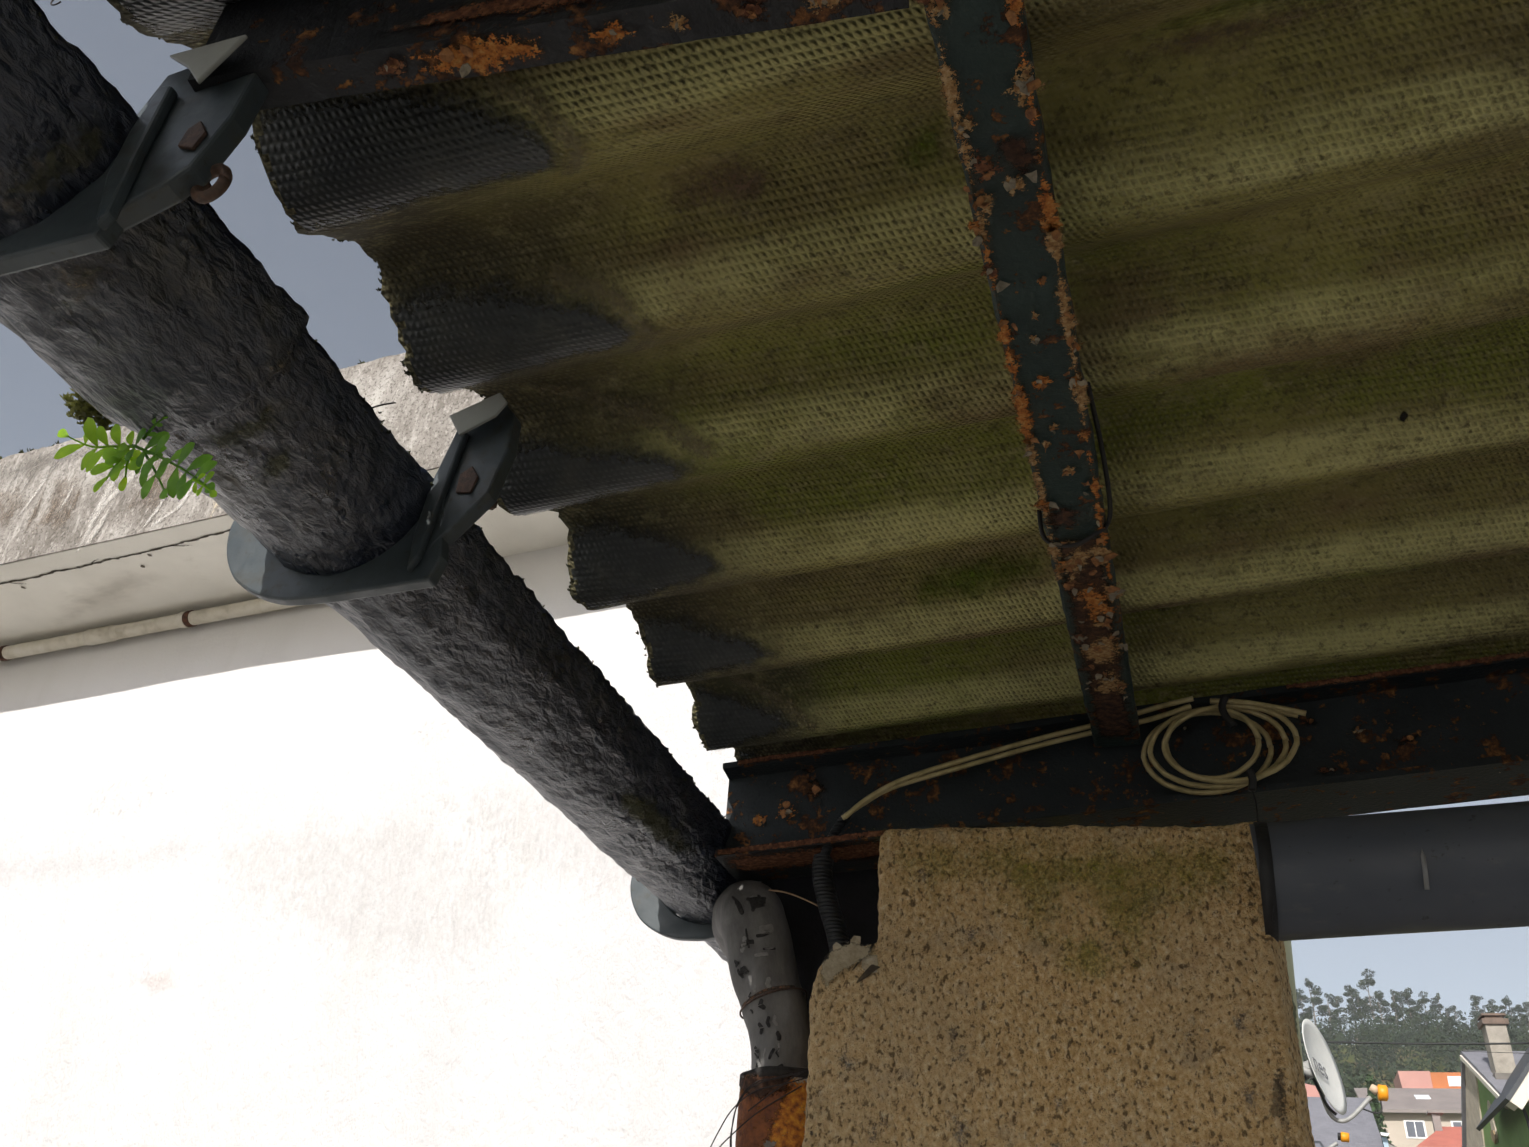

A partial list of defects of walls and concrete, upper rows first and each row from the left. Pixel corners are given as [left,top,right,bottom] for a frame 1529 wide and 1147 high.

rust [375,0,586,78]
rust [588,20,636,45]
rust [660,11,691,33]
water stain [259,73,586,233]
water stain [392,282,633,394]
rust [914,0,1128,700]
water stain [498,439,688,516]
water stain [571,522,720,610]
water stain [639,618,797,760]
rust [1285,651,1529,689]
rust [735,1077,807,1147]